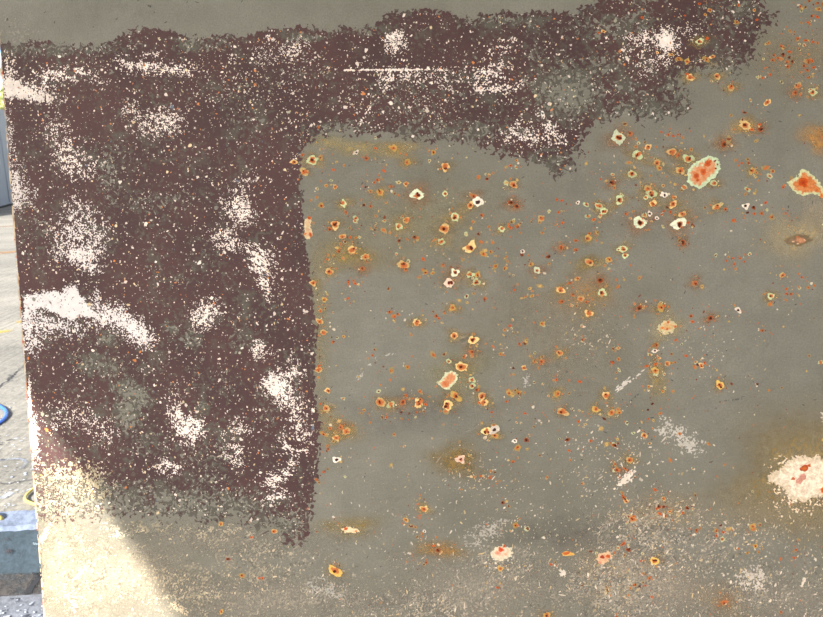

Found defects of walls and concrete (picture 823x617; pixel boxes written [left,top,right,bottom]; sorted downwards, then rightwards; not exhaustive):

rust [710,2,823,104]
spalling [403,181,425,202]
peeling [465,194,484,217]
spalling [609,129,633,146]
rust [584,96,823,253]
spalling [421,257,481,288]
spalling [446,336,493,413]
rust [358,259,643,437]
peeling [481,425,500,439]
rust [433,295,735,607]
rust [749,428,823,526]
rust [330,518,368,535]